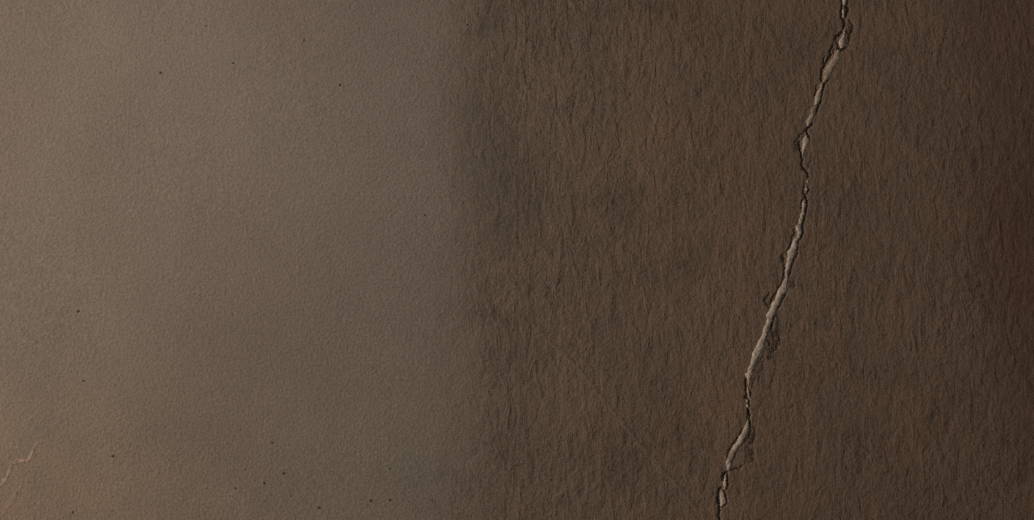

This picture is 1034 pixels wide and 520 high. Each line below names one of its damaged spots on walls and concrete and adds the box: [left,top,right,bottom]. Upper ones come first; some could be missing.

crack [717,0,853,520]